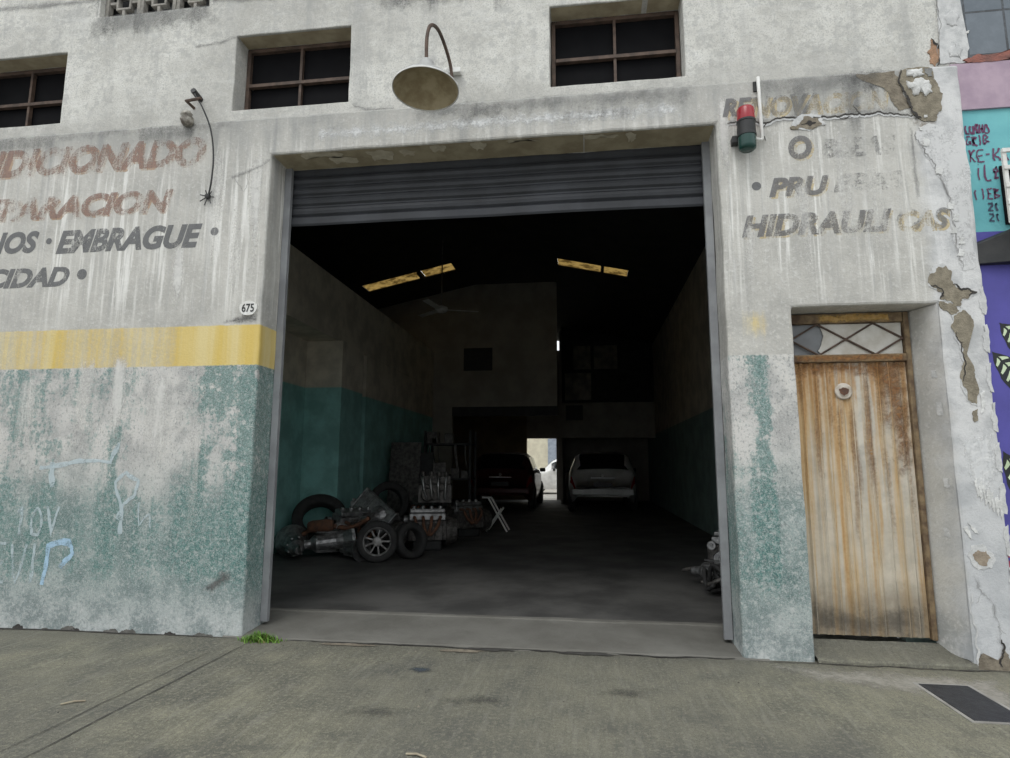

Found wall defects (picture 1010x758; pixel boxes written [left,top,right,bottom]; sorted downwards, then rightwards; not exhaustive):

crack [727,107,919,191]
peeling [854,0,1010,556]
corrosion [795,354,908,475]
peeling [963,523,996,570]
spalling [969,593,1010,671]